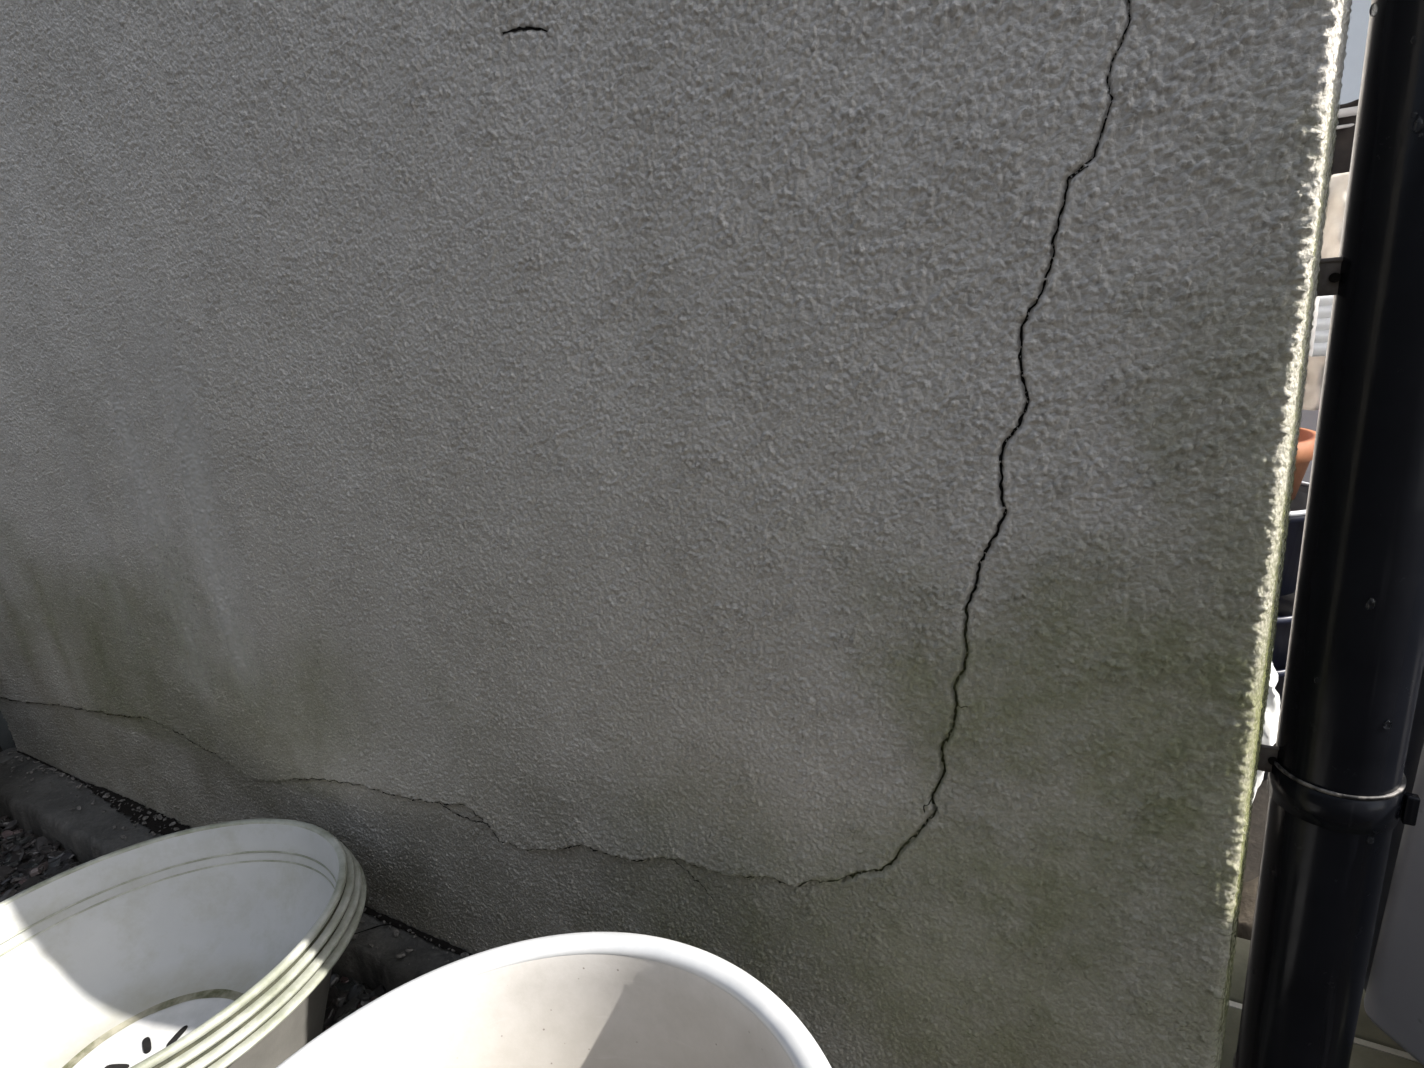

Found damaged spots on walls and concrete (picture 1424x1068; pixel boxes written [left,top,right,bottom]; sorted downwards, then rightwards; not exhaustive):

crack [296,0,1131,901]